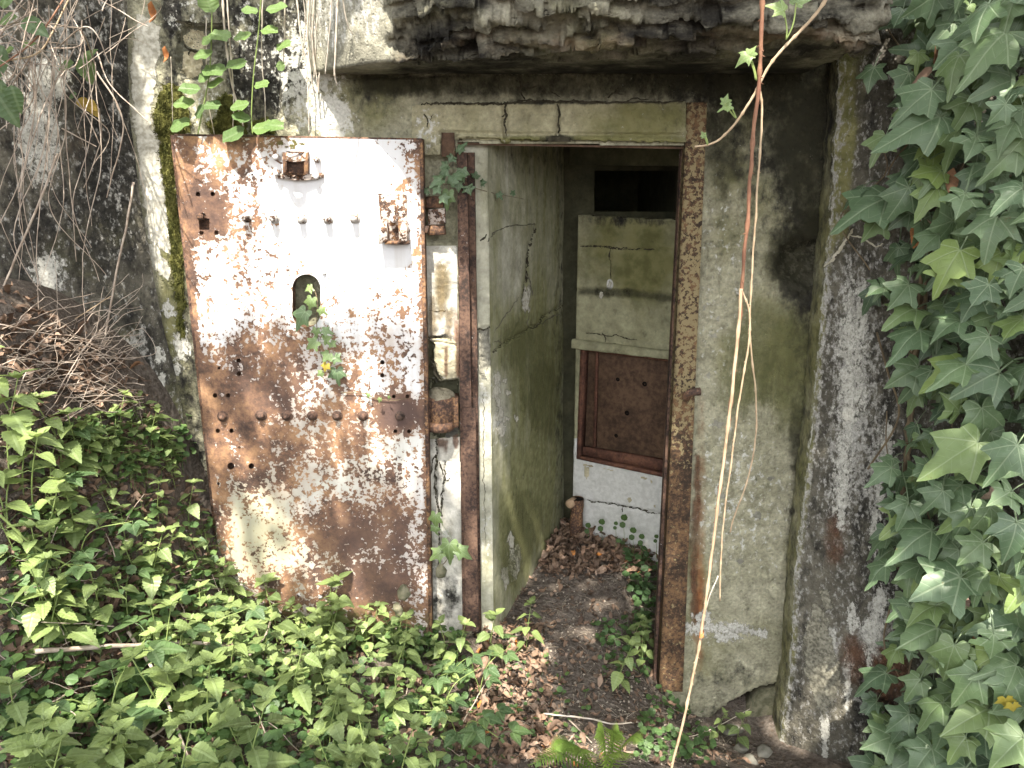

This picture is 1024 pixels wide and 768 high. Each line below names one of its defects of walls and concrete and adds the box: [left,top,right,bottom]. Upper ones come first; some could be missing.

crack [421,78,683,136]
water stain [706,66,828,281]
water stain [160,298,177,318]
crack [477,223,561,353]
crack [580,245,654,281]
water stain [155,334,192,387]
crack [587,333,637,344]
crack [431,439,450,565]
corrosion [690,456,700,621]
water stain [685,609,768,643]